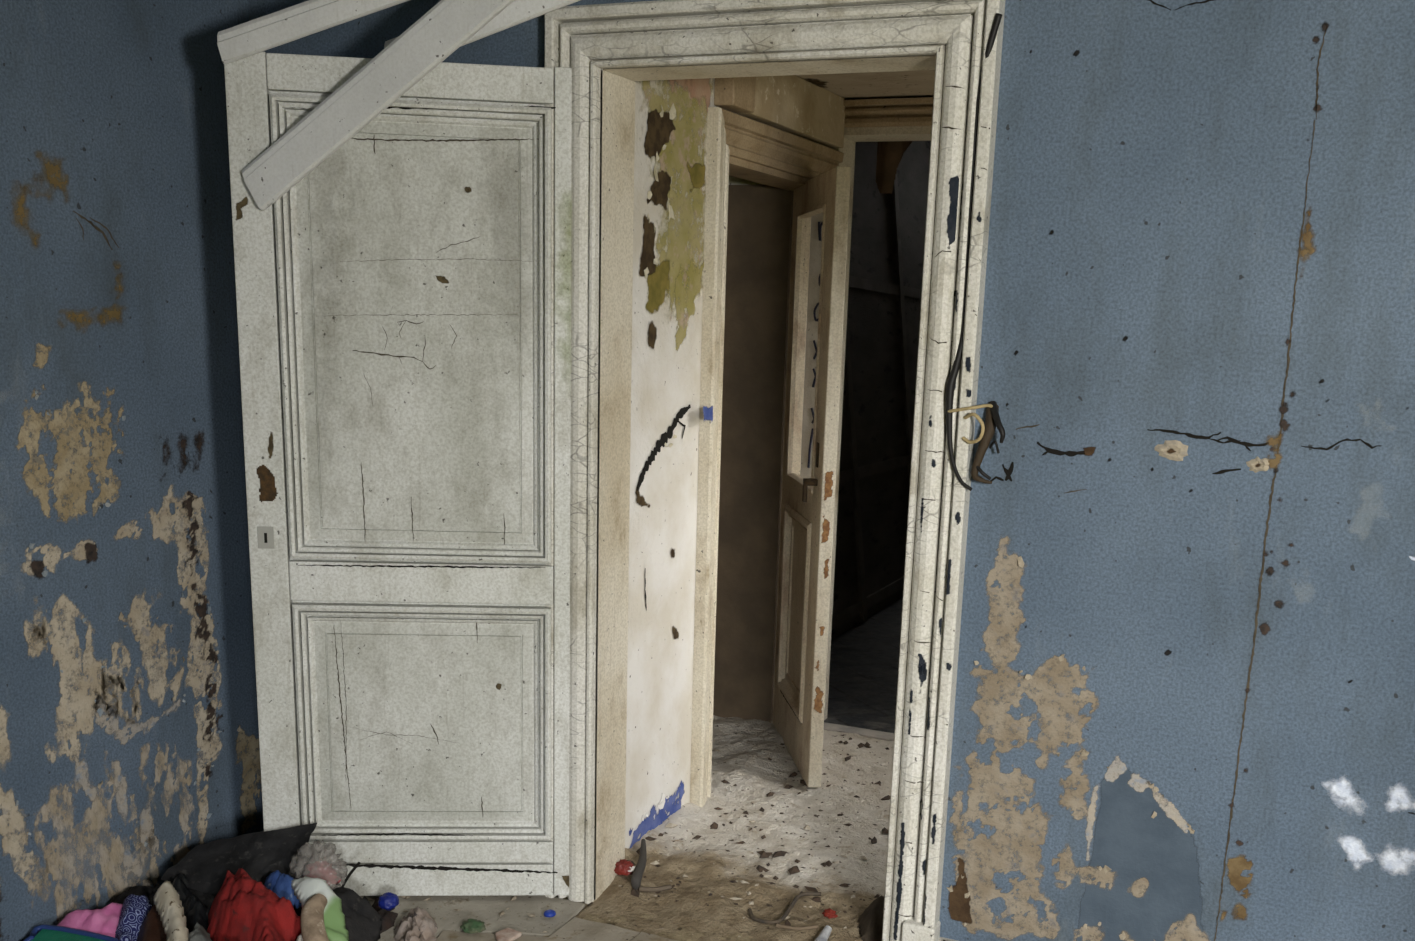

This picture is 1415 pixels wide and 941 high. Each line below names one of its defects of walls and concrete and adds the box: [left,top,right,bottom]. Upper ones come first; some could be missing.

crack [1149,0,1214,10]
flaking render [639,103,676,279]
flaking render [648,321,657,349]
peeling [16,382,126,523]
flaking render [1154,440,1188,461]
crack [1147,22,1381,941]
peeling [0,485,262,924]
peeling [894,536,1149,941]
peeling [1154,914,1209,941]